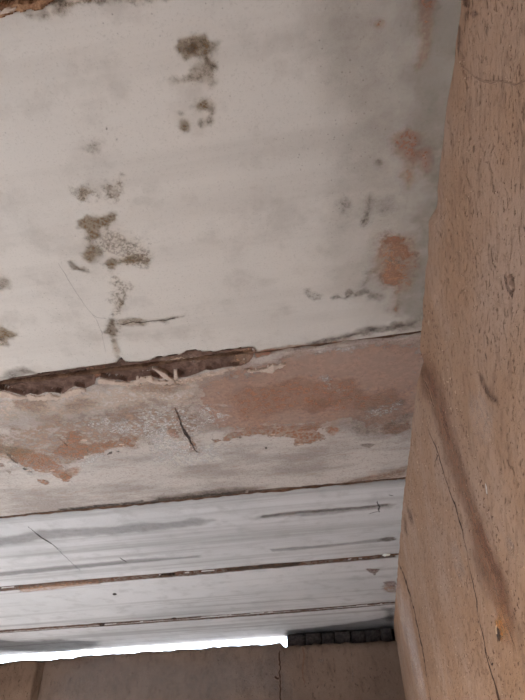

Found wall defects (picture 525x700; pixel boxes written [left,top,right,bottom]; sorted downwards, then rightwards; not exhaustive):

water stain [178,37,216,80]
water stain [79,214,148,269]
corrosion [380,236,418,292]
spalling [0,347,286,401]
crack [175,408,198,453]
crack [428,428,502,700]
crack [398,559,431,700]